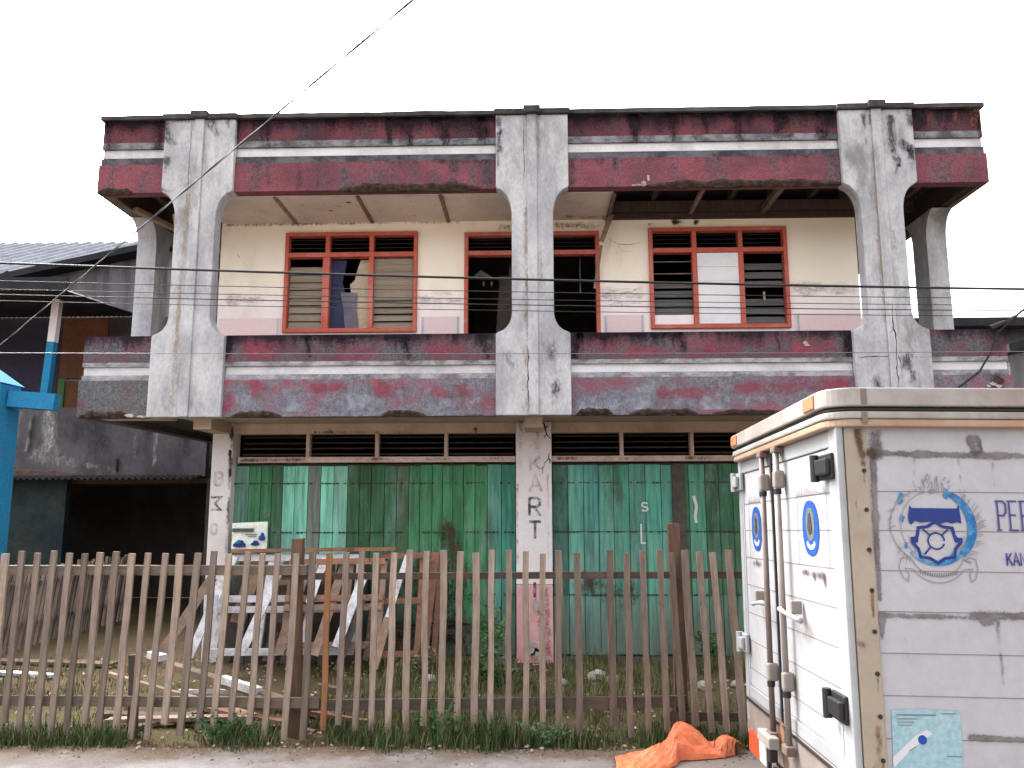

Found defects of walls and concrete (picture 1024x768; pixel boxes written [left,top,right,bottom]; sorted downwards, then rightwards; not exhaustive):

damp [887,109,928,171]
crack [861,305,930,386]
flaking render [338,385,482,417]
flaking render [576,377,784,416]
flaking render [227,385,307,484]